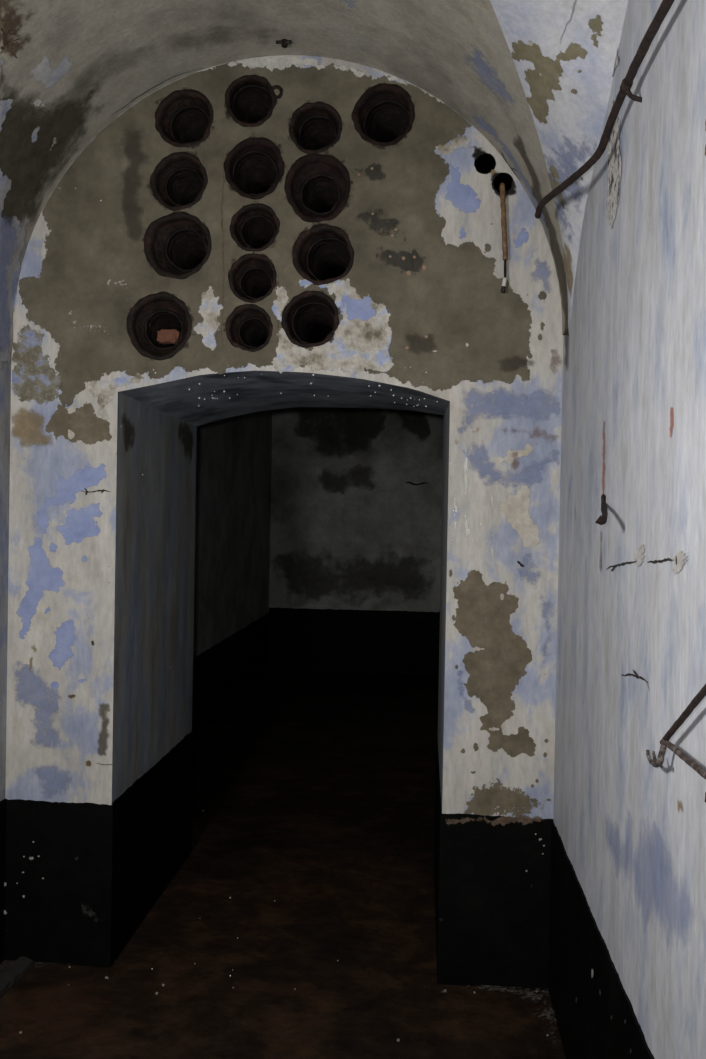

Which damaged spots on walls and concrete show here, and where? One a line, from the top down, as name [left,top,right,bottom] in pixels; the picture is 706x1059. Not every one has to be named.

peeling [511,15,603,124]
crack [560,0,576,43]
leakage [0,75,94,225]
peeling [0,52,560,445]
leakage [297,408,385,455]
leakage [400,411,431,439]
peeling [16,464,107,639]
leakage [279,555,424,598]
peeling [469,444,559,580]
peeling [16,620,76,746]
peeling [449,569,548,757]
peeling [446,771,551,854]